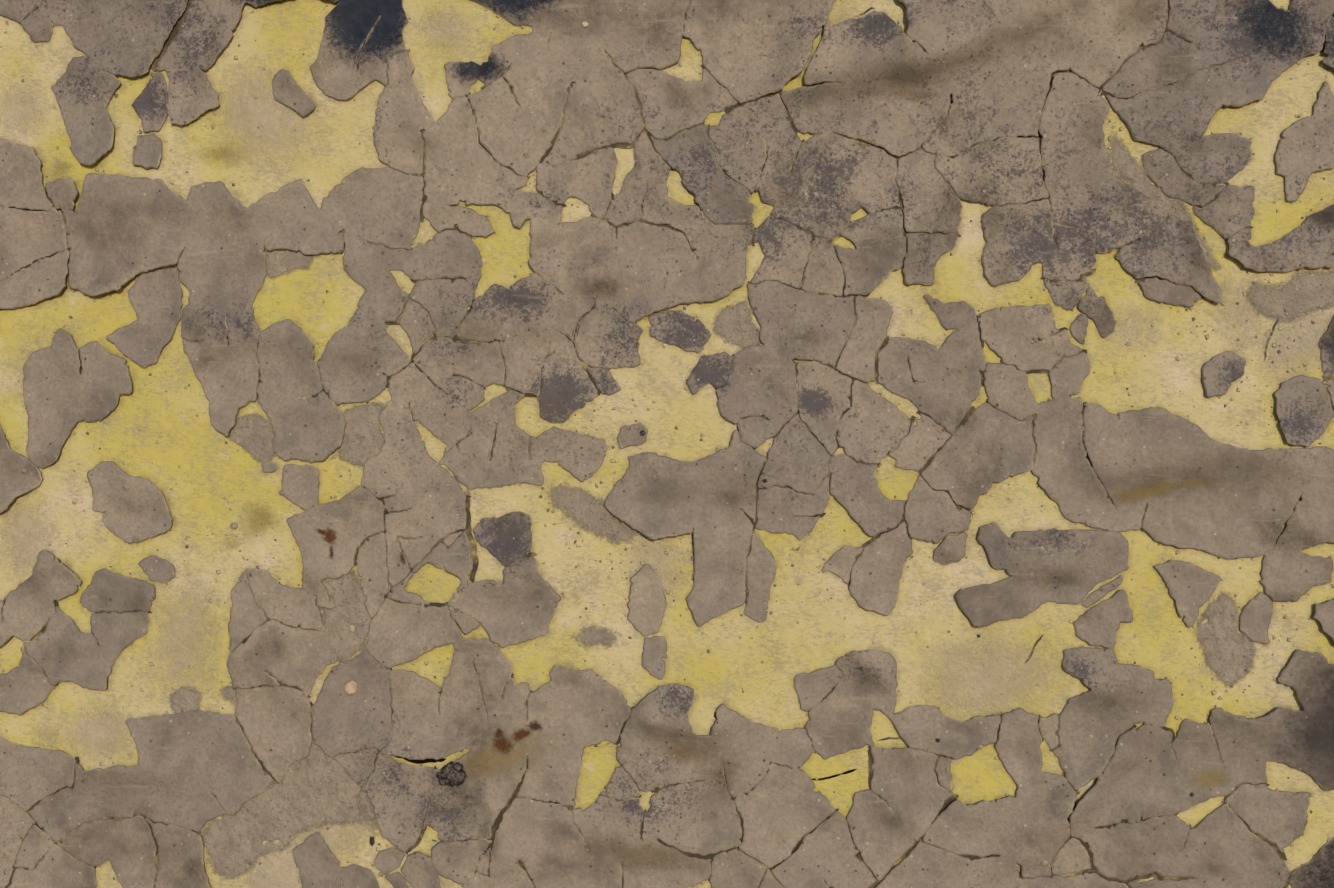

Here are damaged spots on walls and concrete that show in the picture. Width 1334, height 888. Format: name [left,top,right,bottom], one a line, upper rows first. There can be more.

crack [151,0,193,72]
crack [341,131,638,421]
crack [451,0,1229,604]
corrosion [317,529,335,557]
peeling [0,0,877,888]
crack [354,487,537,705]
peeling [310,0,1334,888]
crack [5,757,201,888]
crack [233,671,313,784]
crack [354,747,446,784]
corrosion [494,723,541,753]
crack [465,664,1194,888]